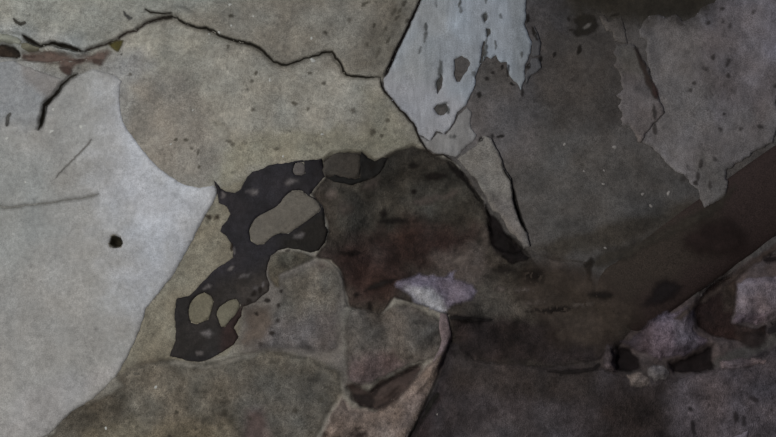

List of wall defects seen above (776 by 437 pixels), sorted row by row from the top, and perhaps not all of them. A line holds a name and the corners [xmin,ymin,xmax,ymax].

peeling [0,61,388,437]
crack [21,0,453,161]
peeling [384,0,541,157]
crack [501,163,527,232]
spalling [314,136,776,437]
peeling [599,0,776,208]